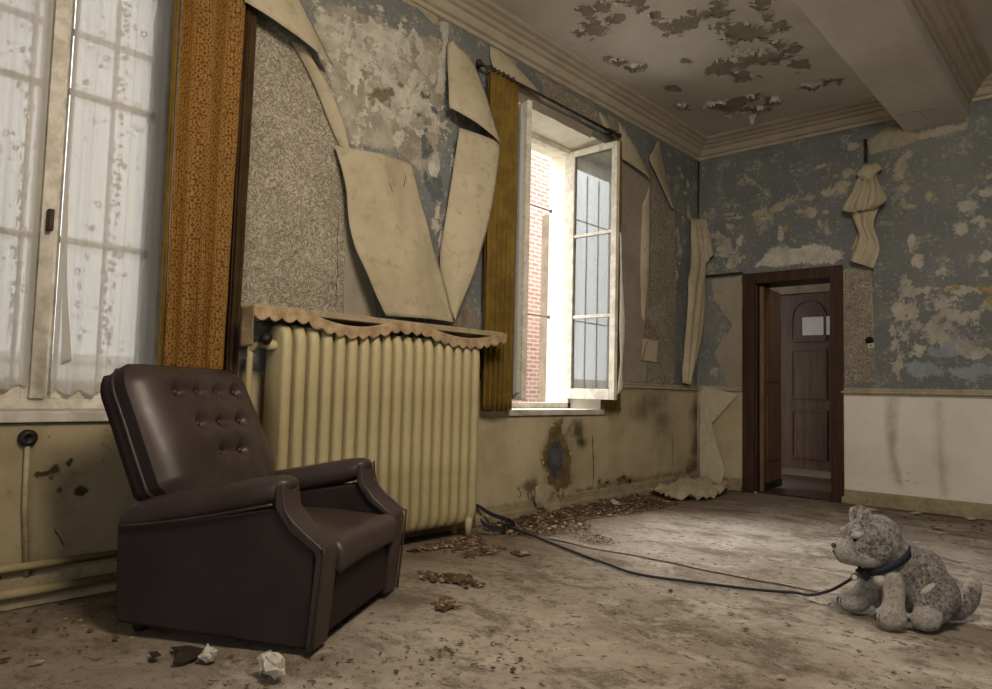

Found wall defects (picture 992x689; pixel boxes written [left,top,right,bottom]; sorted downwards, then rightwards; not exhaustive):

peeling [570,0,845,93]
peeling [305,0,457,258]
peeling [663,85,784,125]
peeling [843,117,969,211]
peeling [952,172,992,239]
peeling [885,233,992,381]